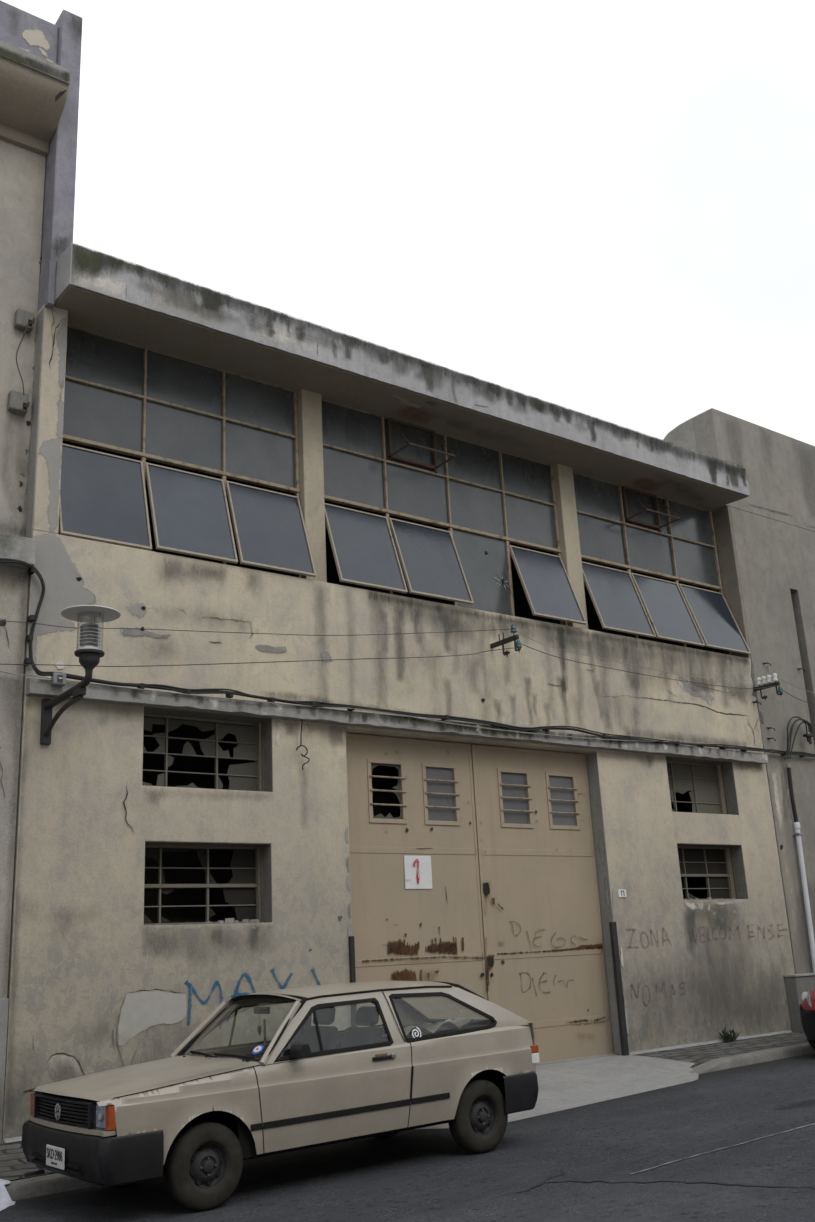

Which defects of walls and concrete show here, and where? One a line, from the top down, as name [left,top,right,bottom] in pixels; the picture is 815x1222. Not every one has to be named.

peeling [22,29,54,63]
damp [56,240,746,486]
peeling [17,318,96,670]
damp [544,626,677,693]
damp [313,709,407,722]
rust [362,927,603,992]
peeling [113,989,187,1067]